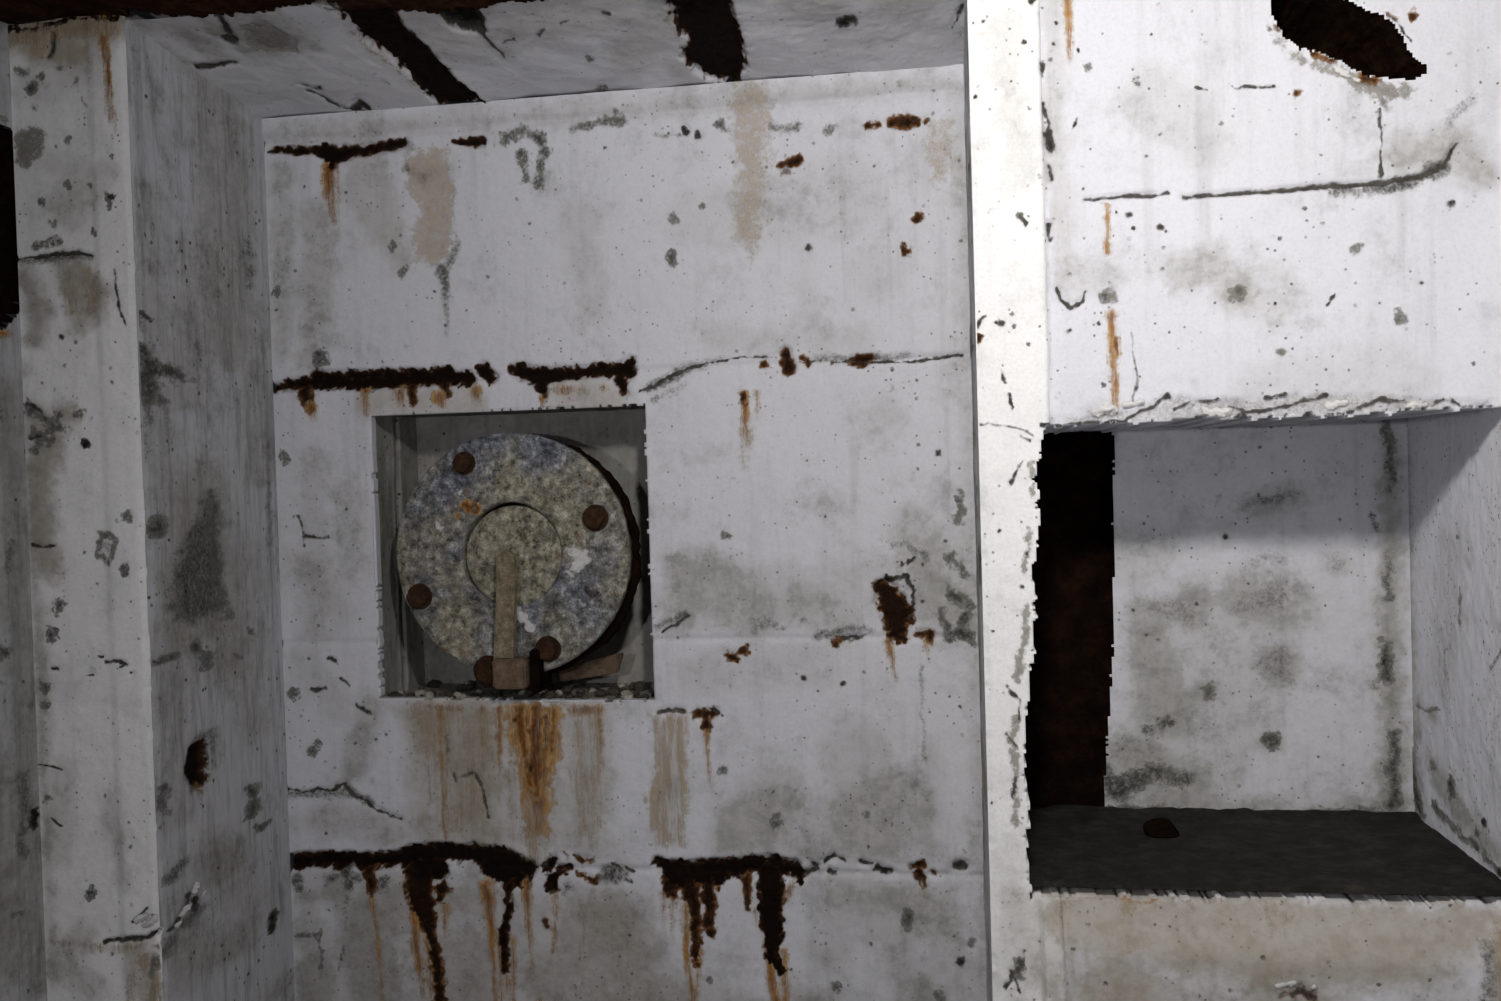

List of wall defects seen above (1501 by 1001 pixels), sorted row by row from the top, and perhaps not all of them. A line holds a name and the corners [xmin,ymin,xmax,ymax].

hole [1271,0,1427,107]
corrosion [267,137,407,222]
crack [1040,62,1055,181]
crack [1084,108,1457,201]
spalling [0,115,44,338]
crack [1045,223,1053,242]
crack [1055,287,1086,310]
corrosion [274,356,637,416]
spalling [1040,392,1490,427]
hole [184,729,215,789]
corrosion [293,702,574,1001]
corrosion [650,853,806,1001]